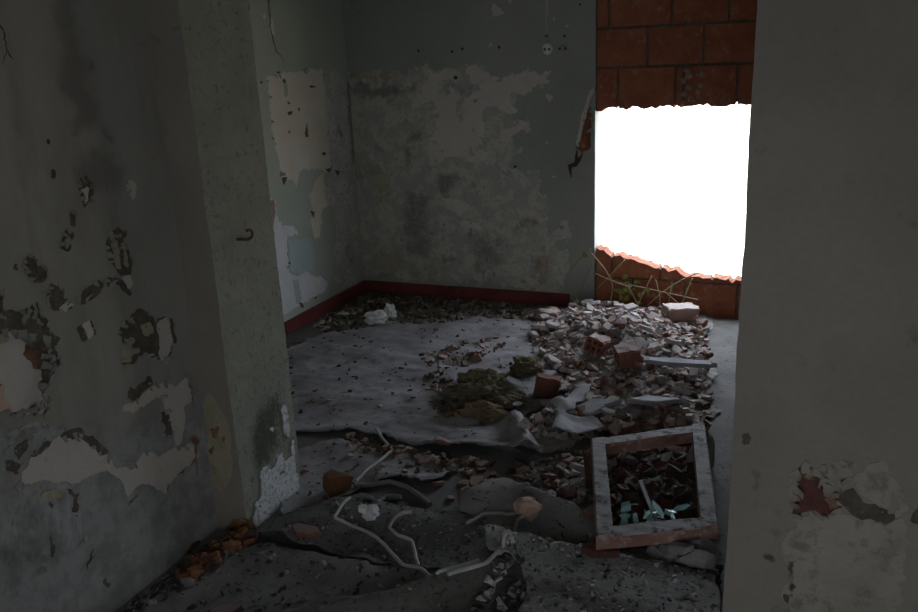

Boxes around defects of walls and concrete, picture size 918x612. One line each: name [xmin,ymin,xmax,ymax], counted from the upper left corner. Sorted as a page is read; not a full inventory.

peeling [411,65,553,171]
spalling [568,88,596,178]
peeling [59,175,95,252]
peeling [266,68,332,315]
spalling [0,227,134,422]
peeling [118,308,177,369]
peeling [15,372,199,507]